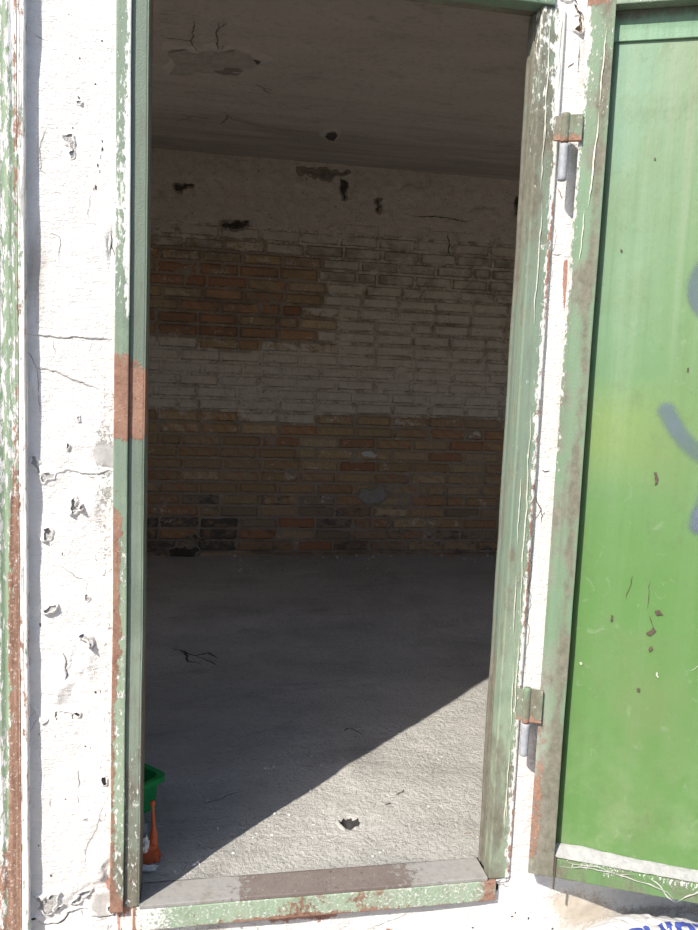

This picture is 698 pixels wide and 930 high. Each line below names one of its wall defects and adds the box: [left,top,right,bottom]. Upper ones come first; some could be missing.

crack [166,20,227,51]
crack [28,330,114,410]
crack [172,648,219,664]
peeling [31,887,94,922]